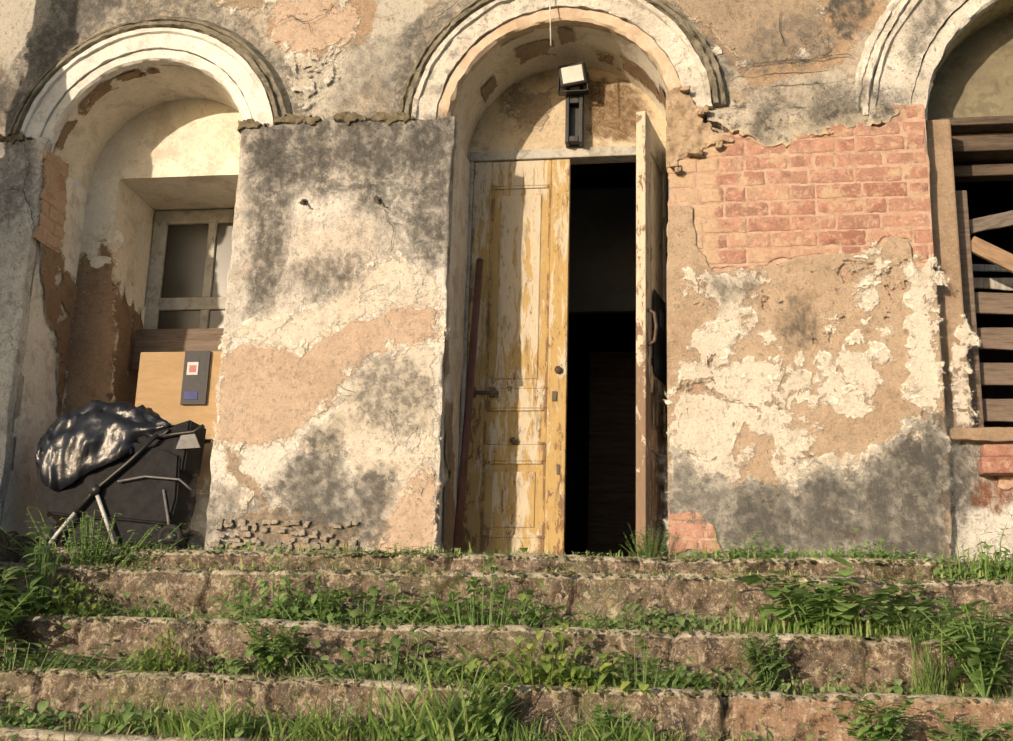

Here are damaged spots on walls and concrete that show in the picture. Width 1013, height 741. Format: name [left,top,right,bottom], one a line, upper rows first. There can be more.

flaking render [33,68,160,254]
peeling [90,230,145,327]
water stain [241,112,451,302]
peeling [596,52,981,560]
peeling [210,250,456,552]
water stain [673,418,981,559]
flaking render [997,476,1013,490]